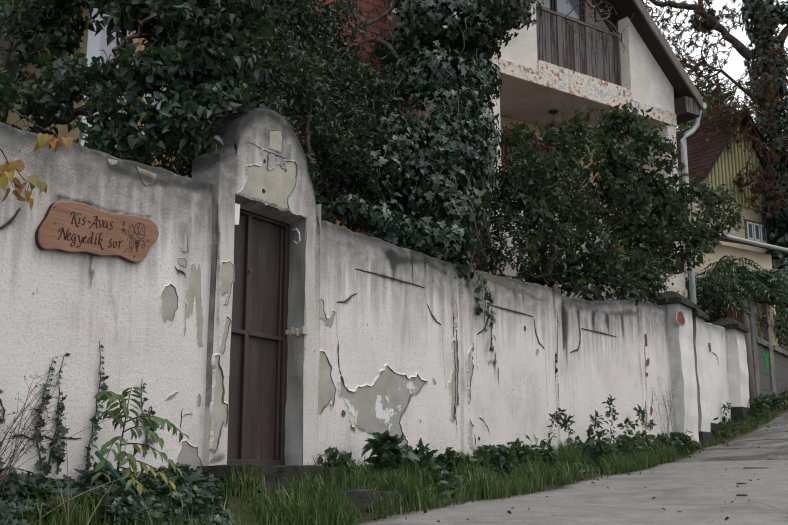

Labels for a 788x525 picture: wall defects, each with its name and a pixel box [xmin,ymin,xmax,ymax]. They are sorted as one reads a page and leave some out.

flaking render [238,129,298,211]
peeling [159,233,205,350]
flaking render [196,314,232,454]
flaking render [219,260,235,296]
flaking render [320,297,336,328]
flaking render [318,349,436,448]
water stain [386,249,447,275]
flaking render [448,300,474,423]
water stain [562,301,580,352]
flaking render [175,439,203,470]